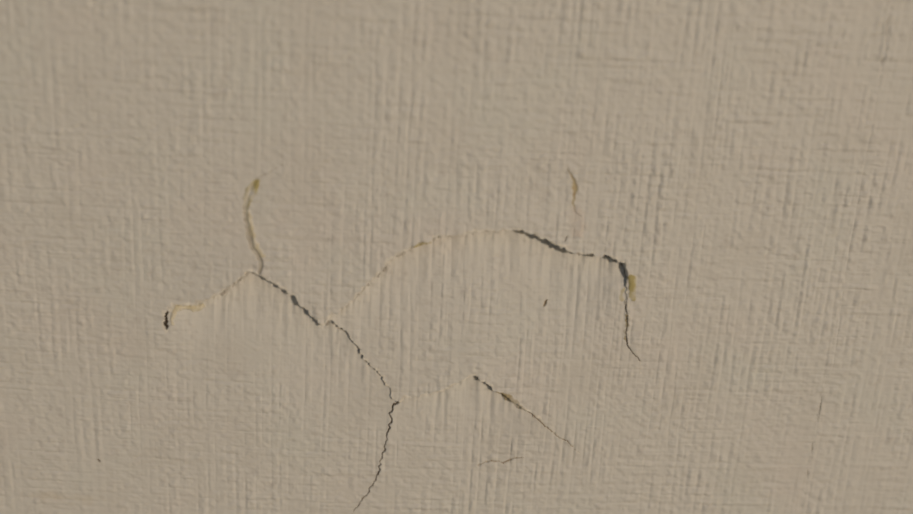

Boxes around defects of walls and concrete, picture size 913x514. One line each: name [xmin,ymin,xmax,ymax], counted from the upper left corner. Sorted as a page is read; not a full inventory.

crack [242,165,282,275]
peeling [162,227,642,457]
crack [354,401,399,510]